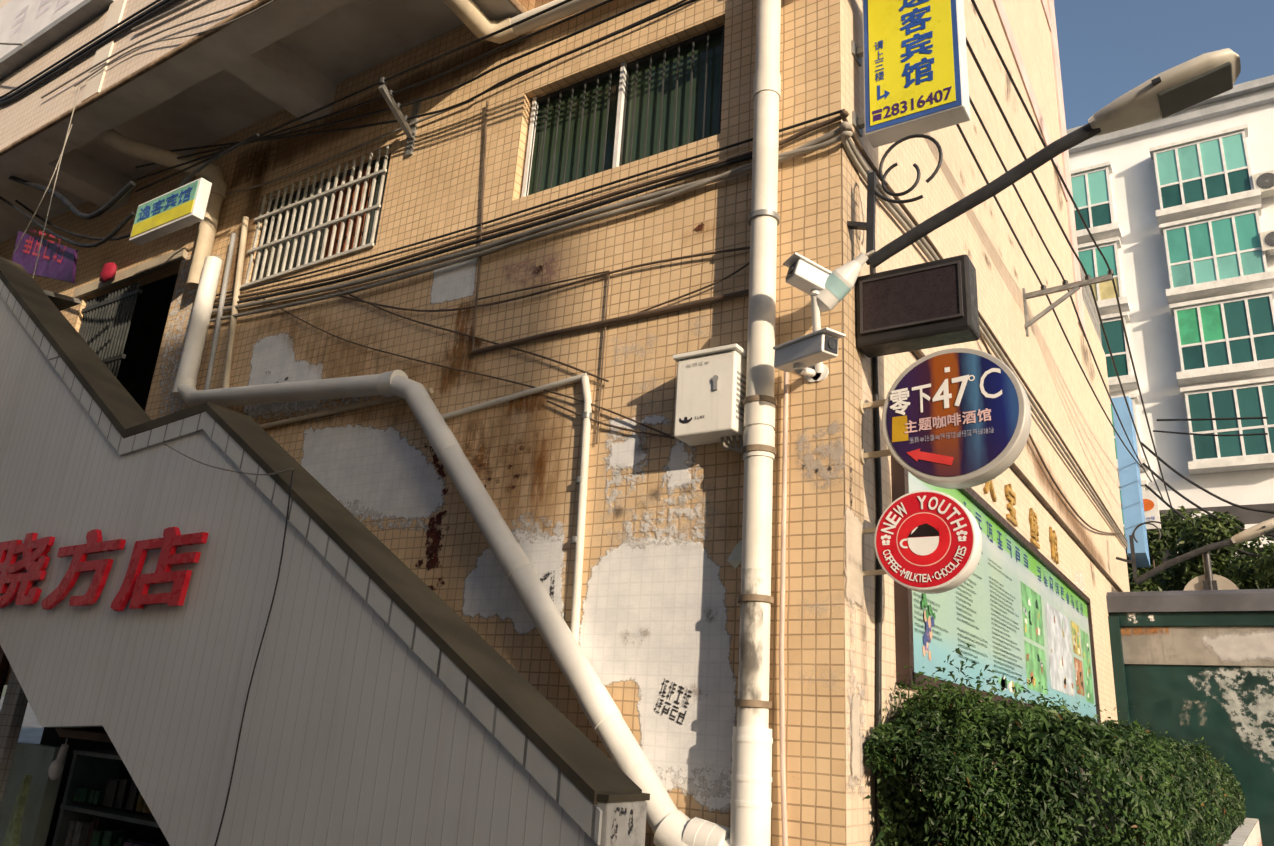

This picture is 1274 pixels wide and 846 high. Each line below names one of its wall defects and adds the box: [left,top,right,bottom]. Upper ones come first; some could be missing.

rust [441,302,482,393]
rust [508,394,544,415]
rust [463,429,520,489]
rust [515,442,546,512]
peeling [1188,666,1274,759]